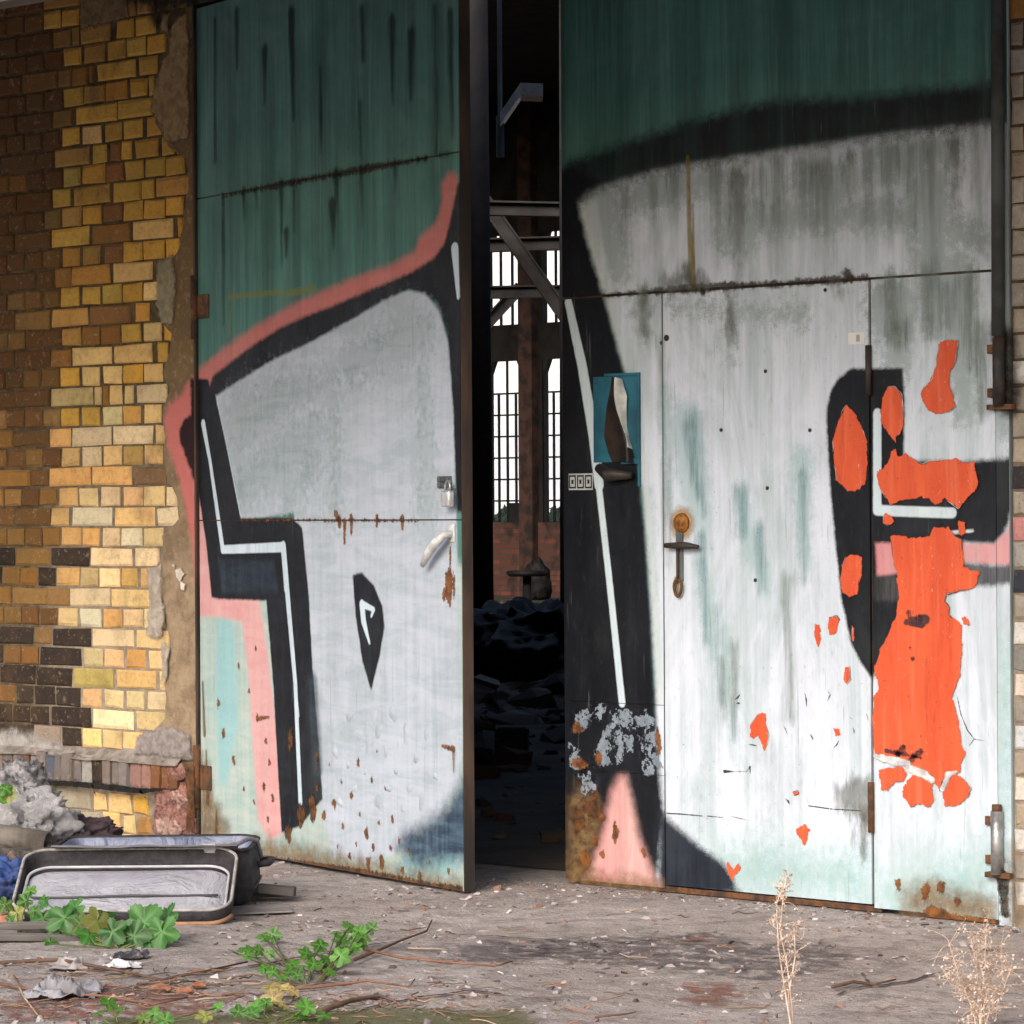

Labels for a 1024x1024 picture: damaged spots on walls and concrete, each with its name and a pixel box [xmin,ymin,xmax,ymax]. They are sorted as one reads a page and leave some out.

rust [603,156,868,305]
rust [240,510,417,544]
peeling [146,564,185,684]
rust [442,546,455,607]
peeling [814,615,855,647]
peeling [832,386,980,807]
peeling [568,704,663,795]
peeling [750,713,769,751]
rust [262,786,463,891]
rust [569,786,630,888]
peeling [796,824,810,845]
rust [910,872,1009,923]